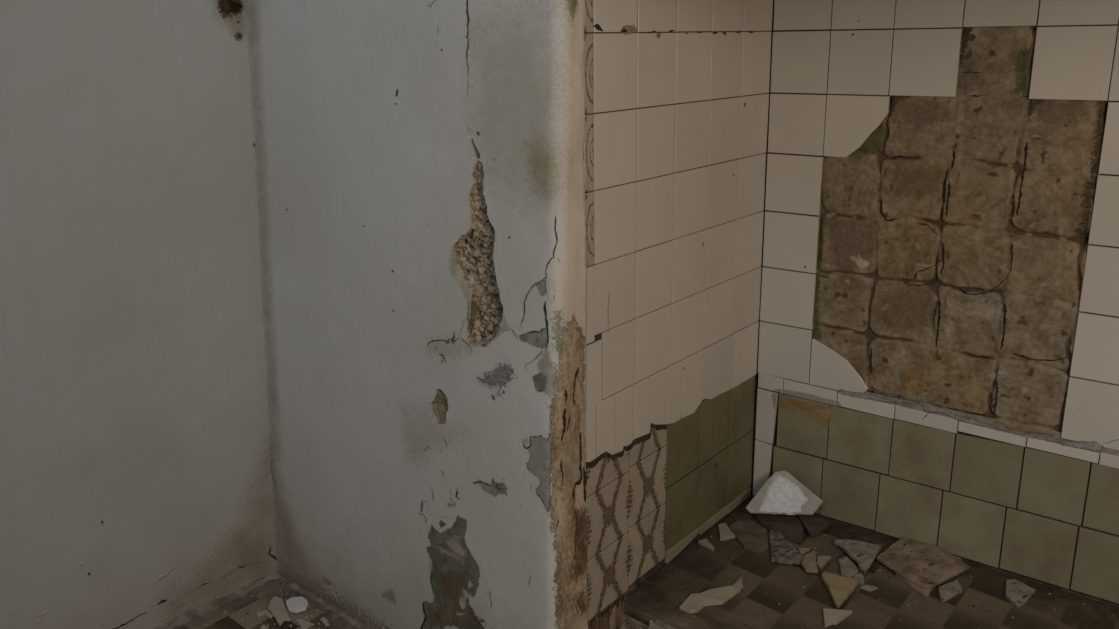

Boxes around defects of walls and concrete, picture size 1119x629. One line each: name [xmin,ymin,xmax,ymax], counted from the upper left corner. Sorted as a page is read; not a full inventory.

rust [217,0,243,32]
crack [463,0,471,95]
peeling [813,24,1111,437]
crack [512,218,559,371]
spalling [452,139,629,629]
crack [113,600,167,629]
flaking render [421,516,485,629]
spalling [679,576,743,614]